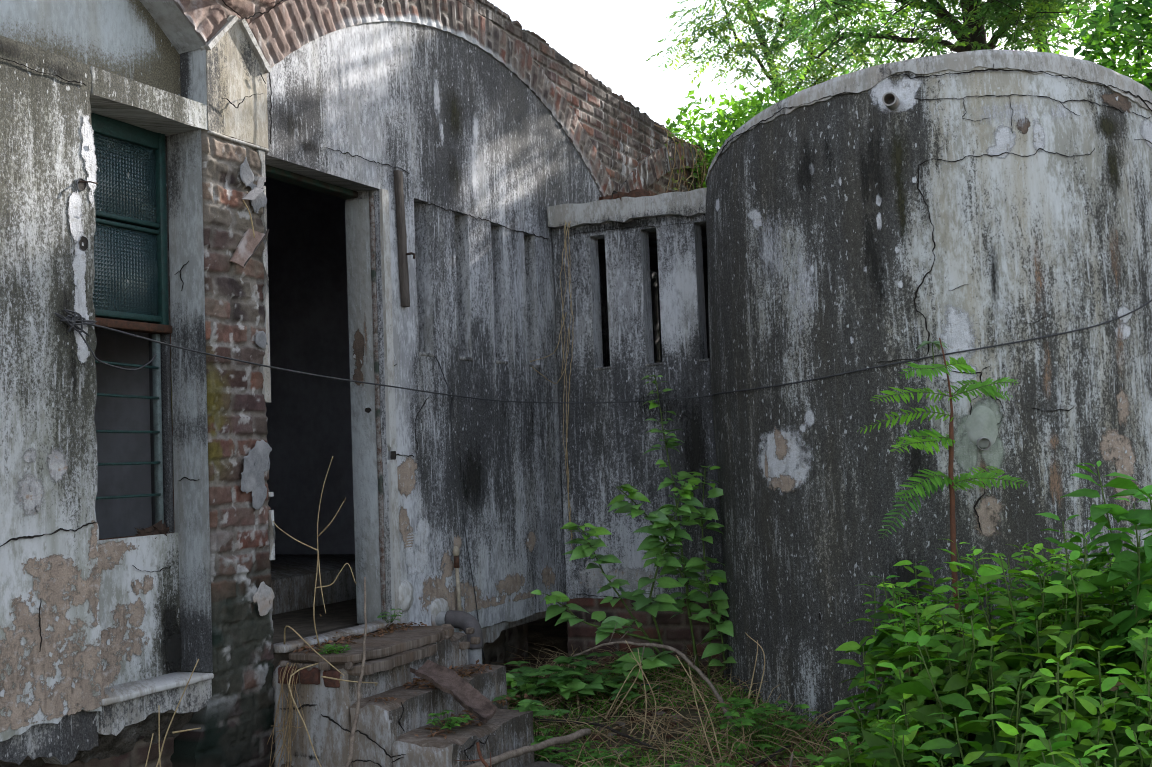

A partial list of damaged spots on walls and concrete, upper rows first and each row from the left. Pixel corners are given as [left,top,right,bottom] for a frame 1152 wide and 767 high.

crack [222,72,272,144]
water stain [326,57,367,153]
water stain [434,80,480,204]
spalling [871,76,923,112]
water stain [1097,115,1119,188]
crack [880,64,1152,426]
spalling [759,409,814,494]
crack [0,522,96,547]
water stain [889,547,924,622]
peeling [0,520,154,733]
spalling [70,712,194,763]
crack [280,702,406,767]